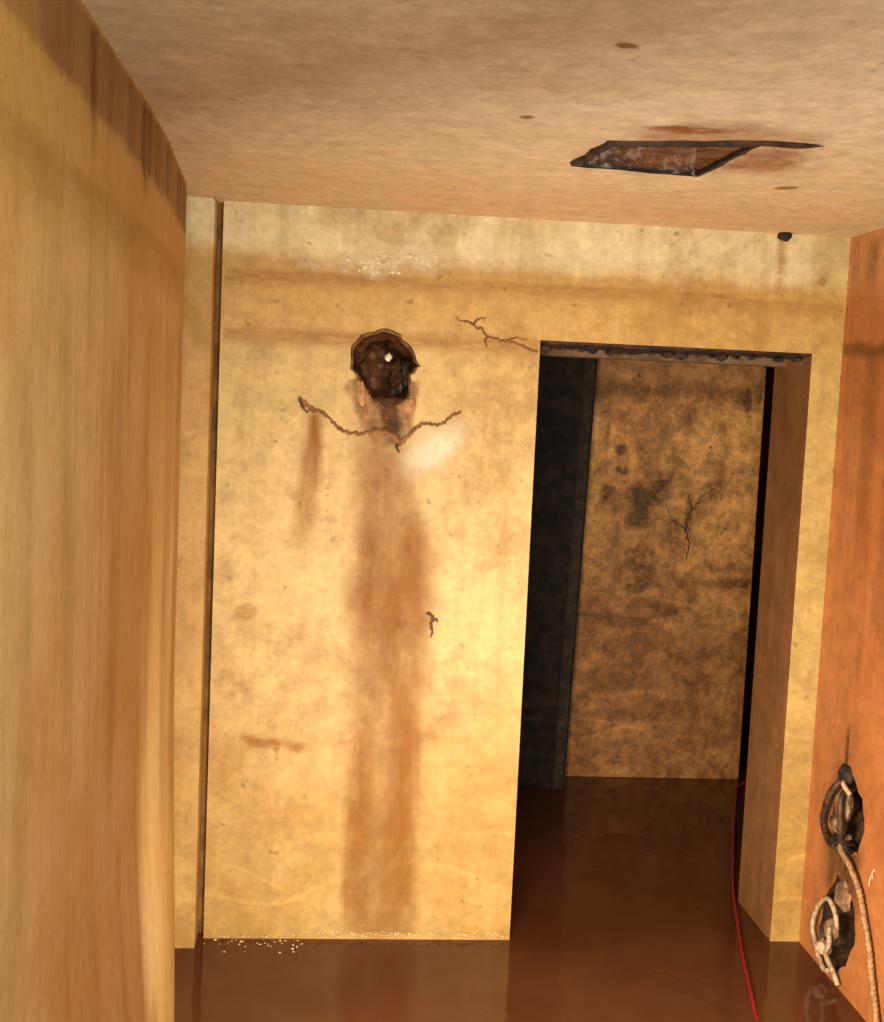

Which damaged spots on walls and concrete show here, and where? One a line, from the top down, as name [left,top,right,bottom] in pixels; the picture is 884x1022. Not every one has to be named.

rust [758,140,825,149]
crack [456,318,538,353]
crack [298,397,461,453]
leakage [625,476,671,526]
rust [359,533,425,649]